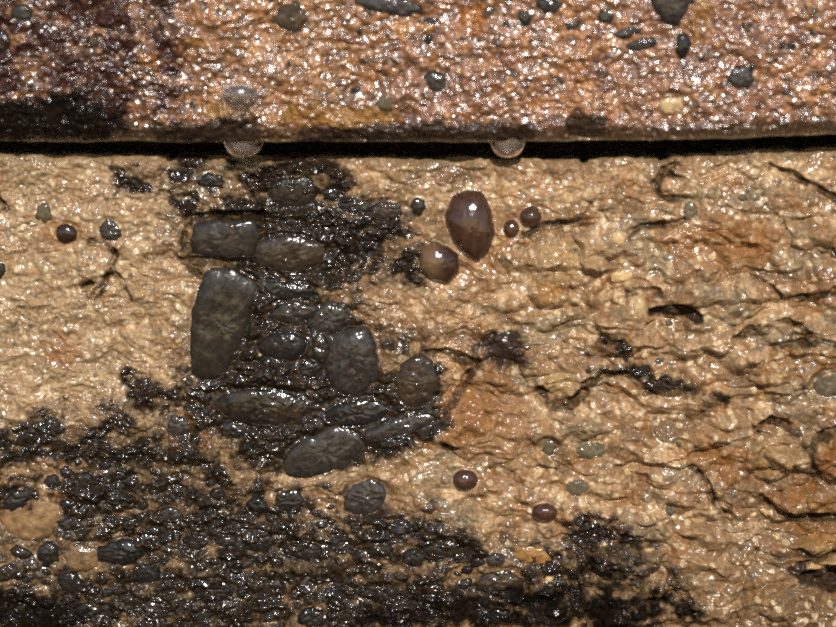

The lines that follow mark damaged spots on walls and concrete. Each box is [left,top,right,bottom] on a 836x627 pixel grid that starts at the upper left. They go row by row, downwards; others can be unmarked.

leakage [0,0,193,141]
crack [628,160,687,239]
crack [769,166,836,204]
crack [737,284,836,348]
leakage [0,153,705,627]
leakage [712,391,731,406]
crack [755,416,836,485]
crack [688,466,731,513]
crack [759,496,836,523]
crack [755,547,836,563]